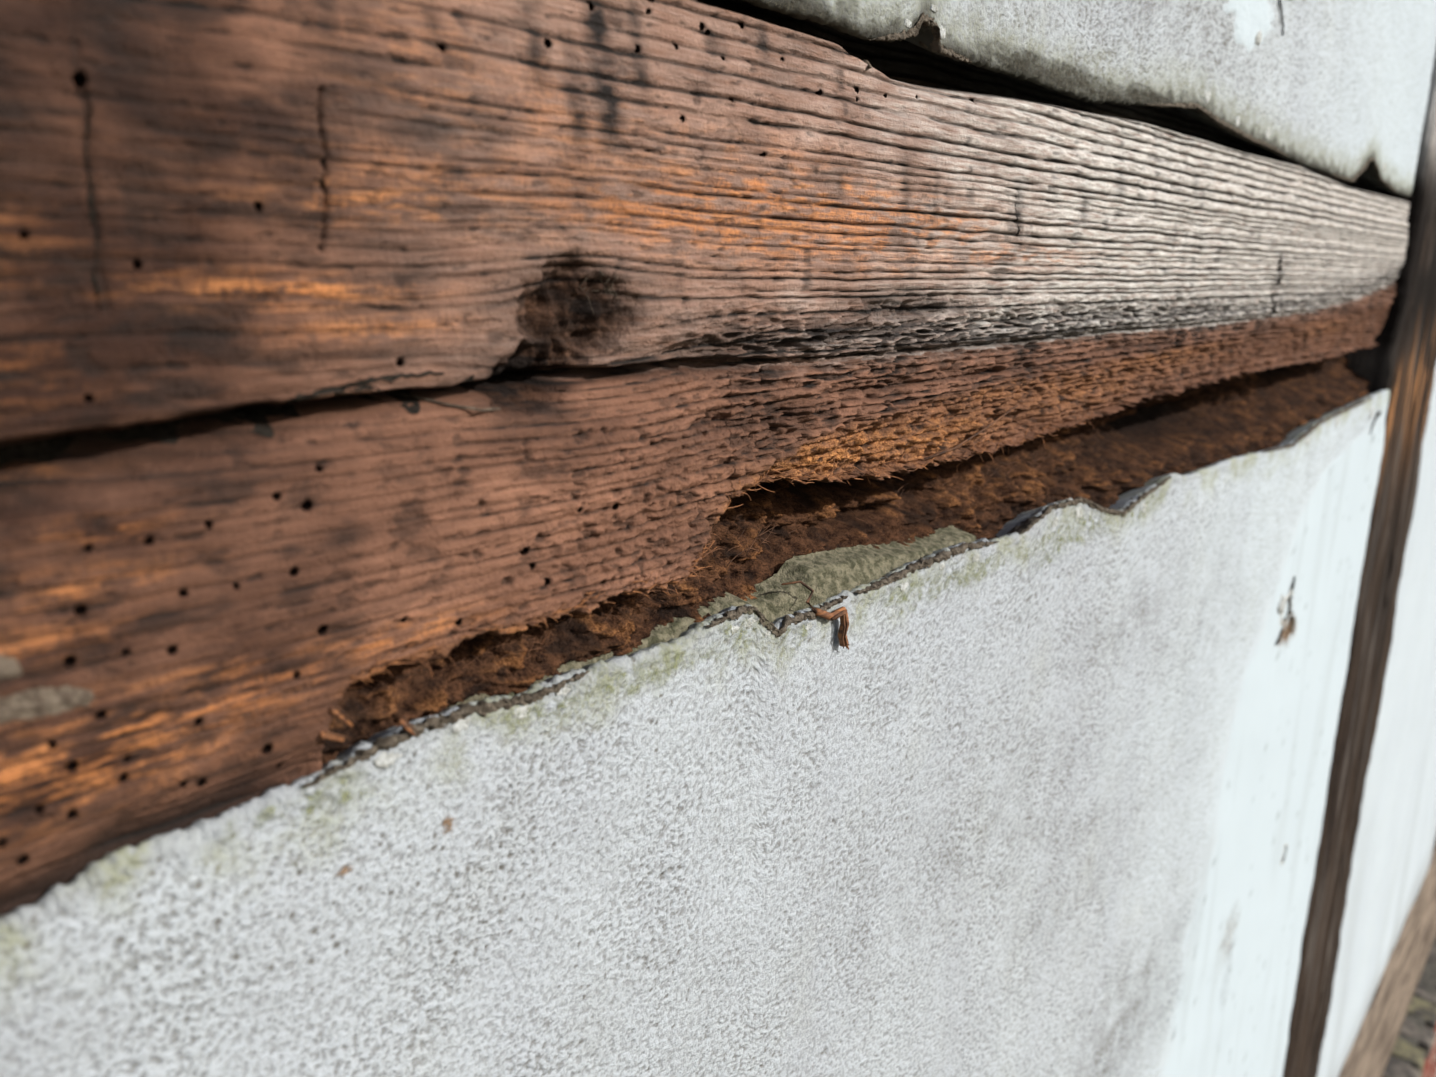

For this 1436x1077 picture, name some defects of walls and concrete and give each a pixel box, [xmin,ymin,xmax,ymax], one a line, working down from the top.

peeling [1223,0,1292,53]
spalling [705,476,1172,638]
spalling [1275,576,1296,646]